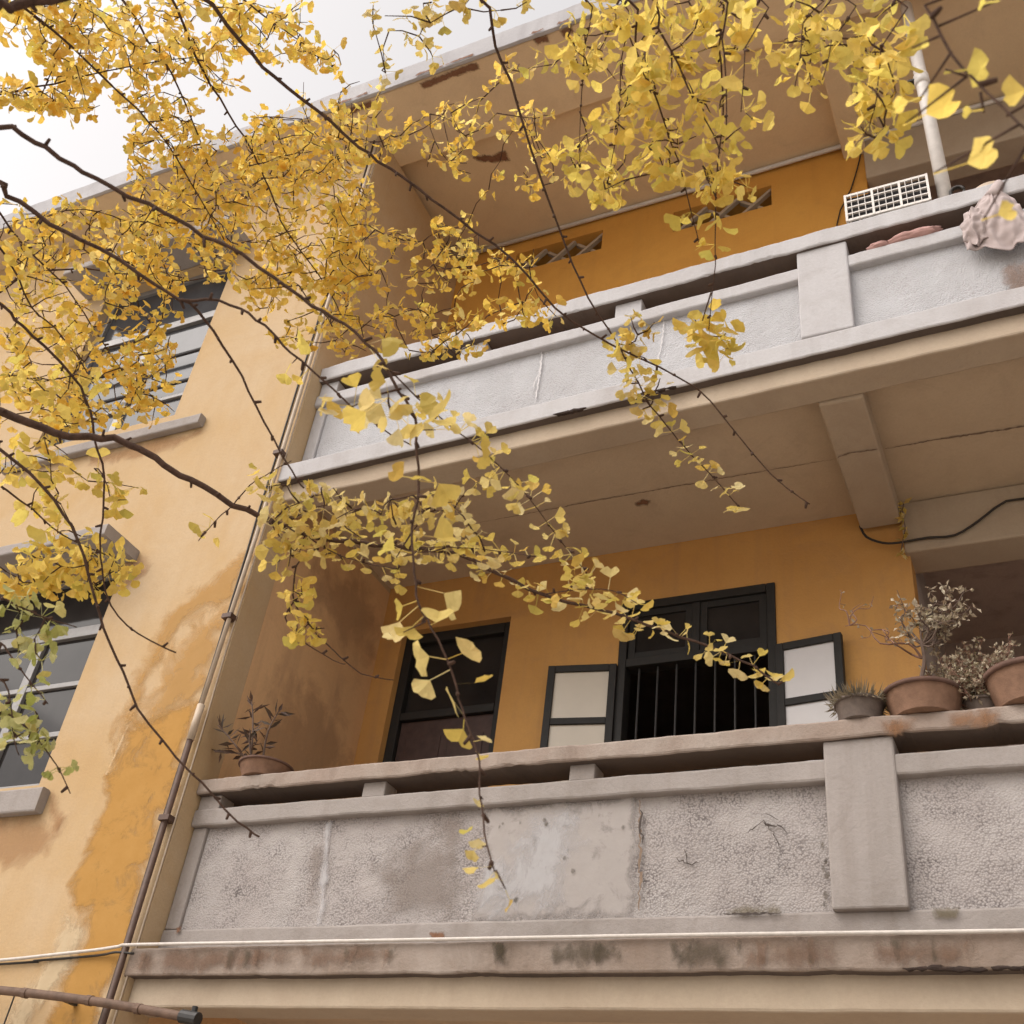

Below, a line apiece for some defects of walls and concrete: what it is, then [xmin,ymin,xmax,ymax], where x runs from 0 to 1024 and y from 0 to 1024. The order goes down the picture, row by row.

crack [480,426,1024,523]
crack [637,800,645,909]
crack [748,814,787,849]
damp [553,945,610,962]